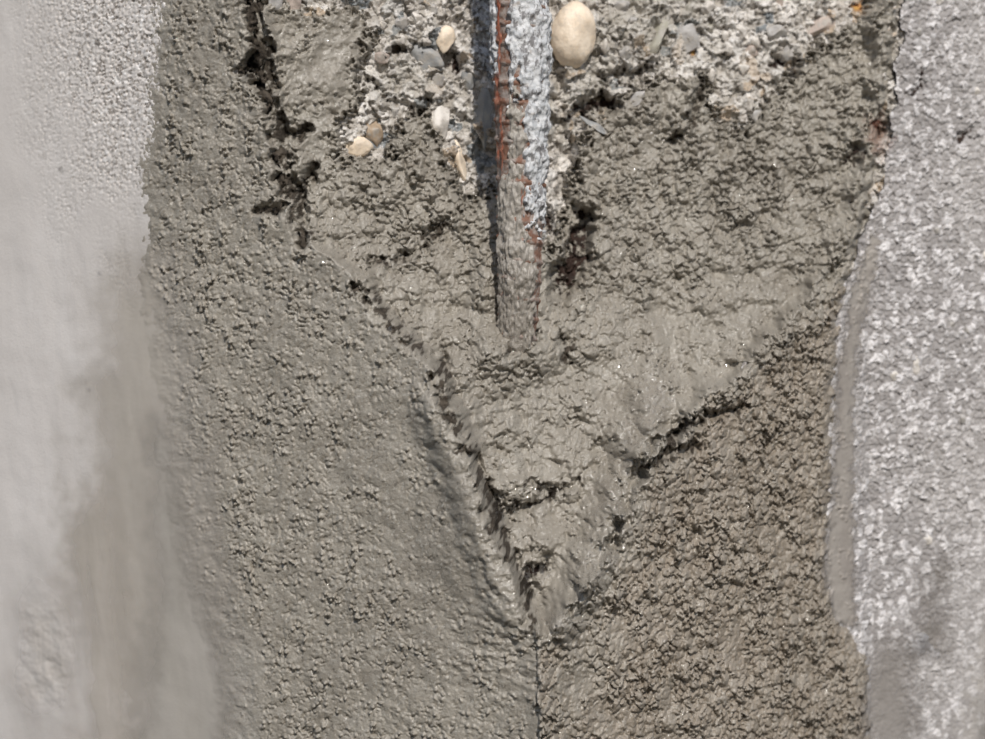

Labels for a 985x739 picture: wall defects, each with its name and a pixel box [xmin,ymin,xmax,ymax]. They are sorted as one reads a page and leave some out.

crack [231,0,321,247]
spalling [268,0,498,200]
corrosion [494,0,504,171]
spalling [543,0,867,253]
spalling [865,0,905,209]
crack [350,221,581,635]
crack [640,399,750,469]